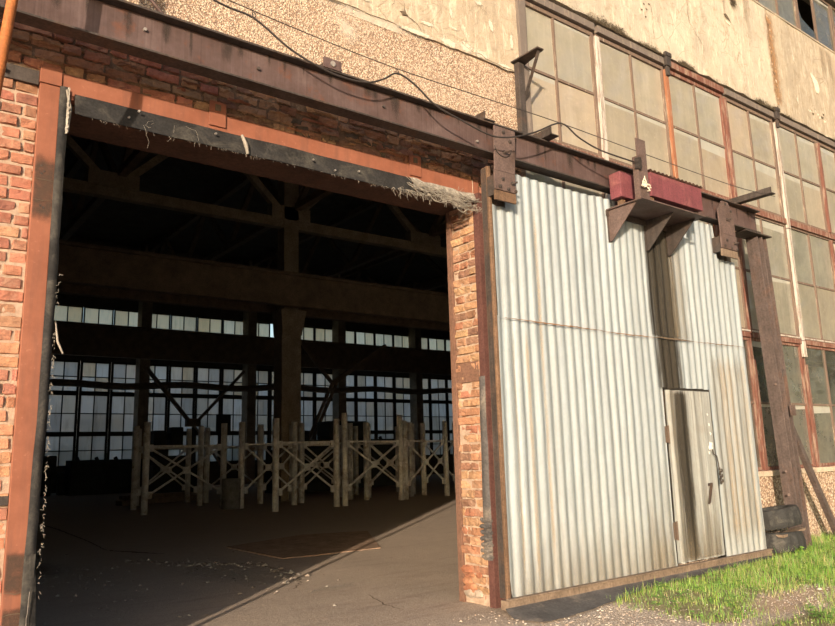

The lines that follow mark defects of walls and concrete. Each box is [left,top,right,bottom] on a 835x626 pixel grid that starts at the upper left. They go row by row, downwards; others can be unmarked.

flaking render [397,20,515,72]
leakage [643,226,701,560]